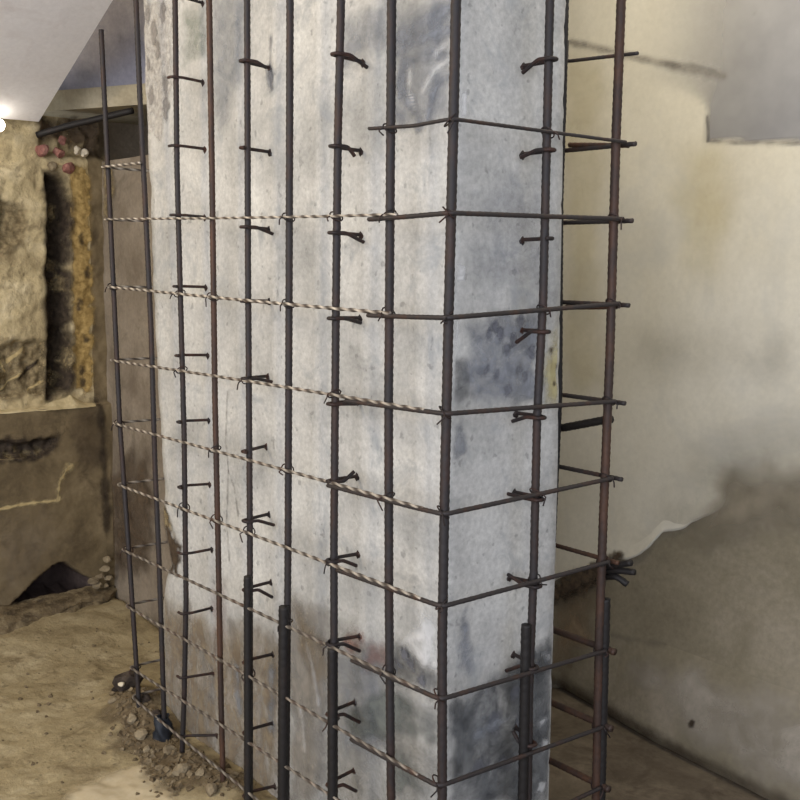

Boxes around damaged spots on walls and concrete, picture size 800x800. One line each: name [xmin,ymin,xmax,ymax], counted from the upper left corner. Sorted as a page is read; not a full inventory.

flaking render [0,166,94,401]
damp [456,315,537,398]
damp [449,663,520,800]
damp [532,591,589,799]